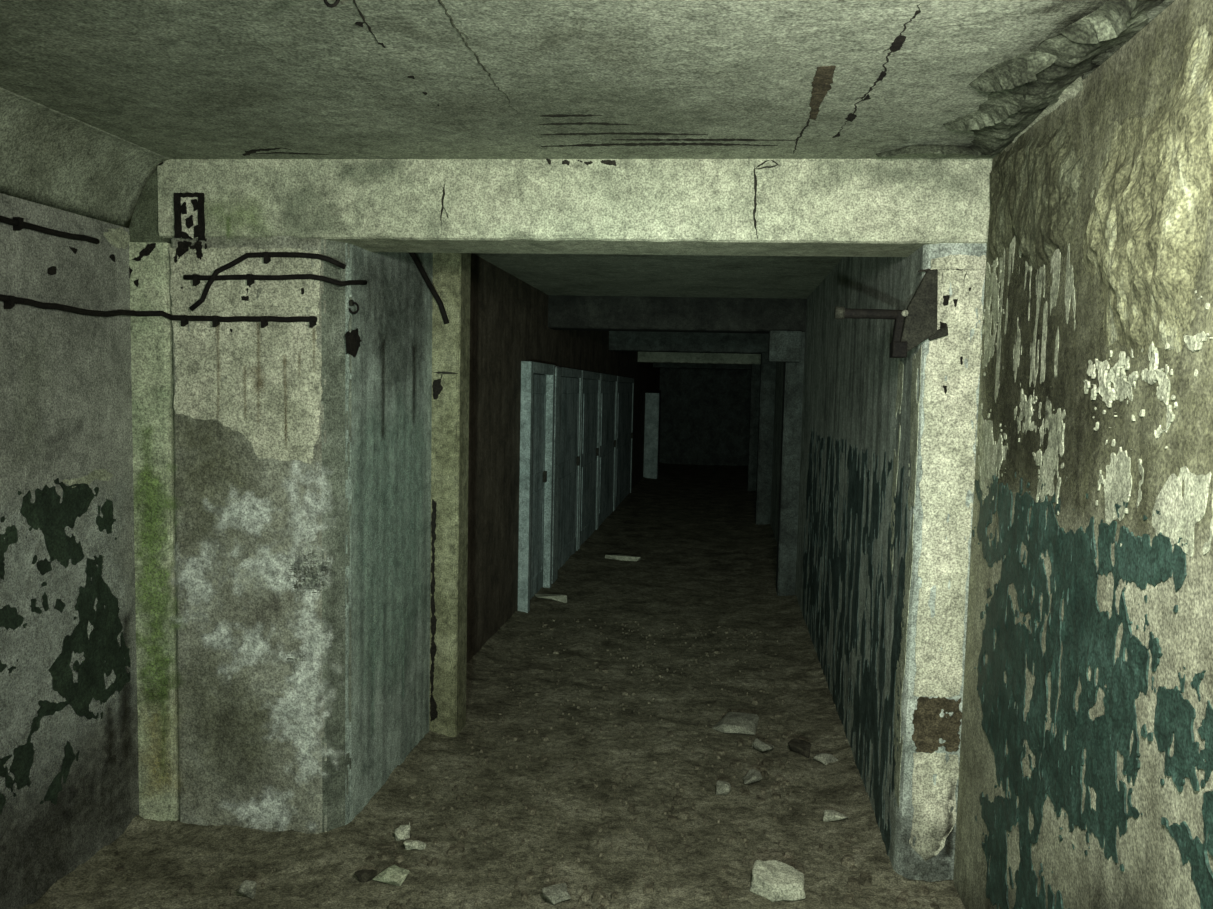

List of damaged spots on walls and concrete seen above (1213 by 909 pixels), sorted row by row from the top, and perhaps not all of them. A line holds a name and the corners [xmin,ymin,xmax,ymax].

crack [438,0,811,238]
crack [839,3,921,134]
spalling [890,36,906,52]
peeling [876,144,986,157]
peeling [943,52,1057,130]
peeling [1013,77,1083,143]
peeling [1059,0,1137,44]
damp [177,542,215,625]
damp [203,460,335,781]
peeling [803,236,1213,909]
damp [226,792,292,830]